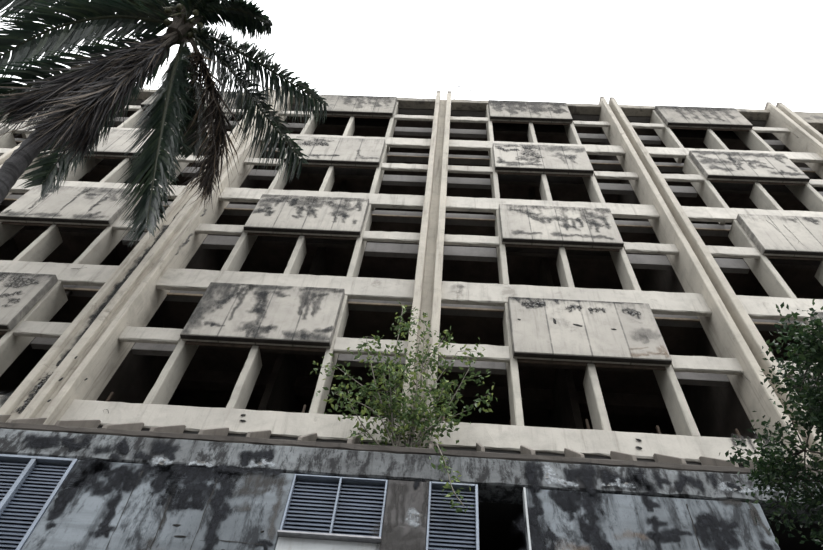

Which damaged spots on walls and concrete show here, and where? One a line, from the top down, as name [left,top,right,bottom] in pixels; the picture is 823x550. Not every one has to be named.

water stain [254,198,361,224]
water stain [510,208,613,239]
water stain [182,282,291,338]
water stain [298,287,343,319]
water stain [284,326,333,340]
water stain [23,434,287,550]
water stain [519,460,774,550]